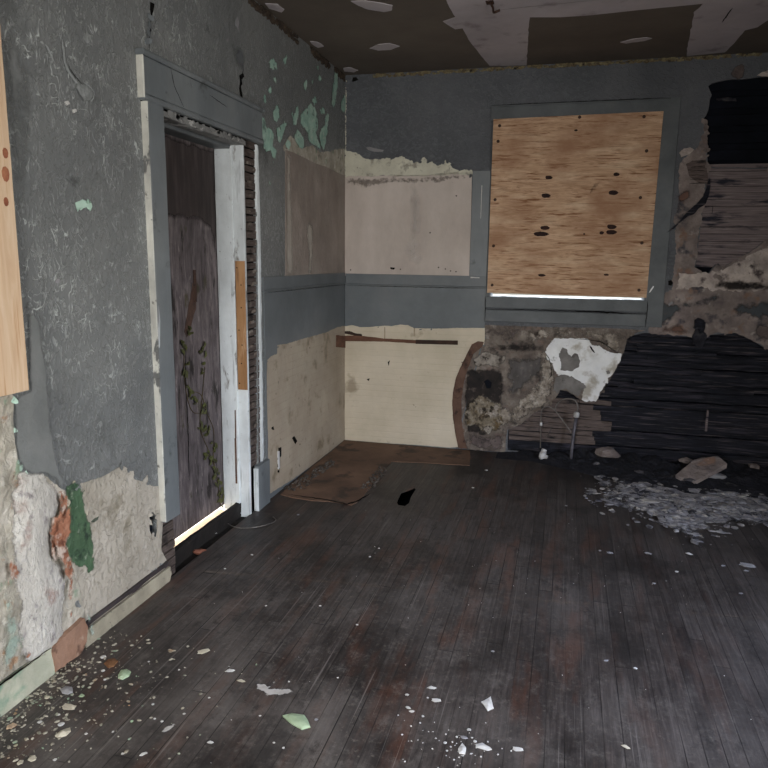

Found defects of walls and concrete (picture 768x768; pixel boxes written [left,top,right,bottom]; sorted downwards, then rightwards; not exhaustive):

crack [237,72,245,98]
spalling [248,0,299,45]
peeling [262,46,768,493]
peeling [0,394,167,682]